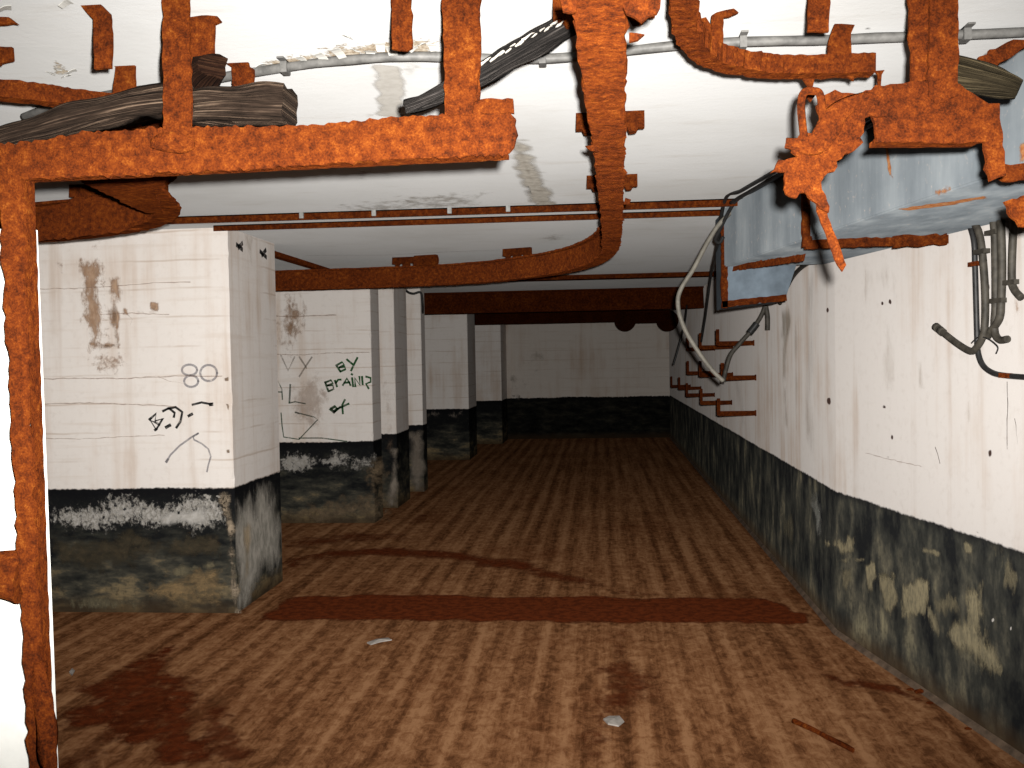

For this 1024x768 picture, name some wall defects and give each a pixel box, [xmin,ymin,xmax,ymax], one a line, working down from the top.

water stain [514,142,555,205]
corrosion [901,189,985,210]
water stain [812,494,820,534]